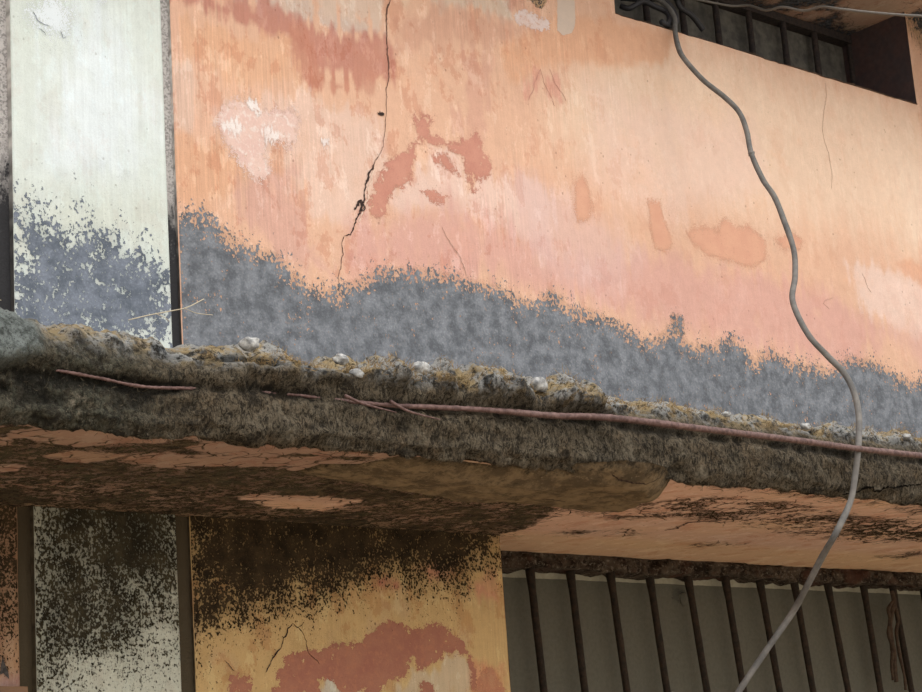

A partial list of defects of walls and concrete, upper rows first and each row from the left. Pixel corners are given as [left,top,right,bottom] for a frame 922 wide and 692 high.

peeling [18,0,81,46]
leakage [742,0,863,35]
leakage [907,3,922,45]
crack [338,0,391,289]
leakage [13,172,922,438]
spalling [0,307,922,506]
leakage [0,424,922,692]
peeling [227,672,253,692]
peeling [271,619,507,692]